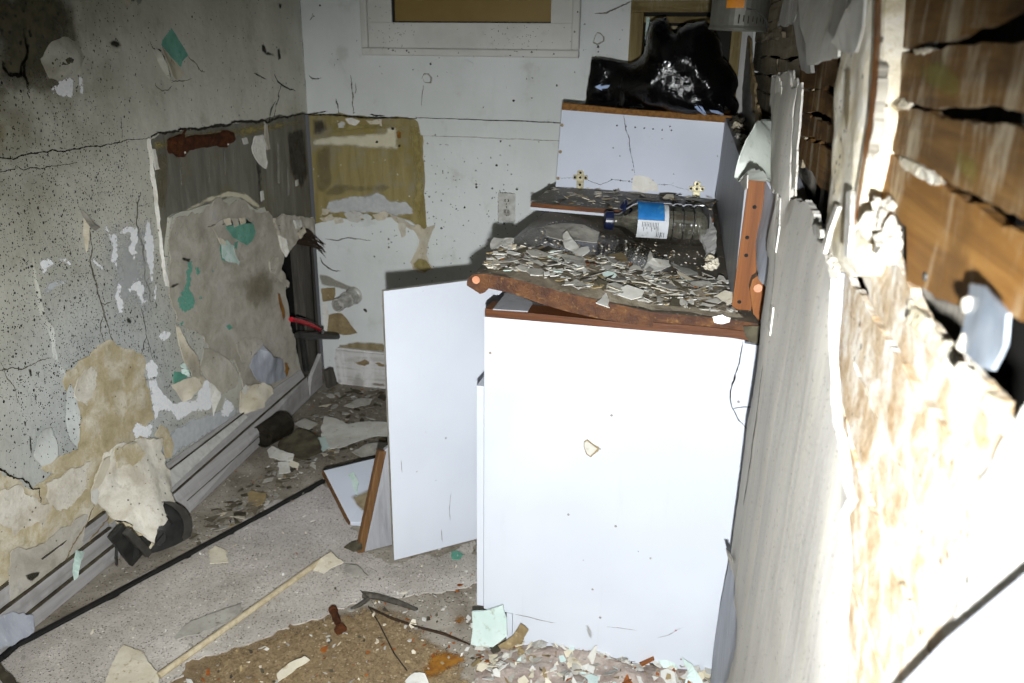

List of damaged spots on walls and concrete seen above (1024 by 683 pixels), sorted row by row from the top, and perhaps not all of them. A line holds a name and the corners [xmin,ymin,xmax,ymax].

crack [2,26,30,99]
peeling [798,0,867,65]
crack [0,73,424,172]
peeling [345,118,382,126]
peeling [79,207,100,253]
flaking render [147,139,435,416]
hole [983,316,1024,410]
flaking render [0,257,176,649]
peeling [278,461,291,474]